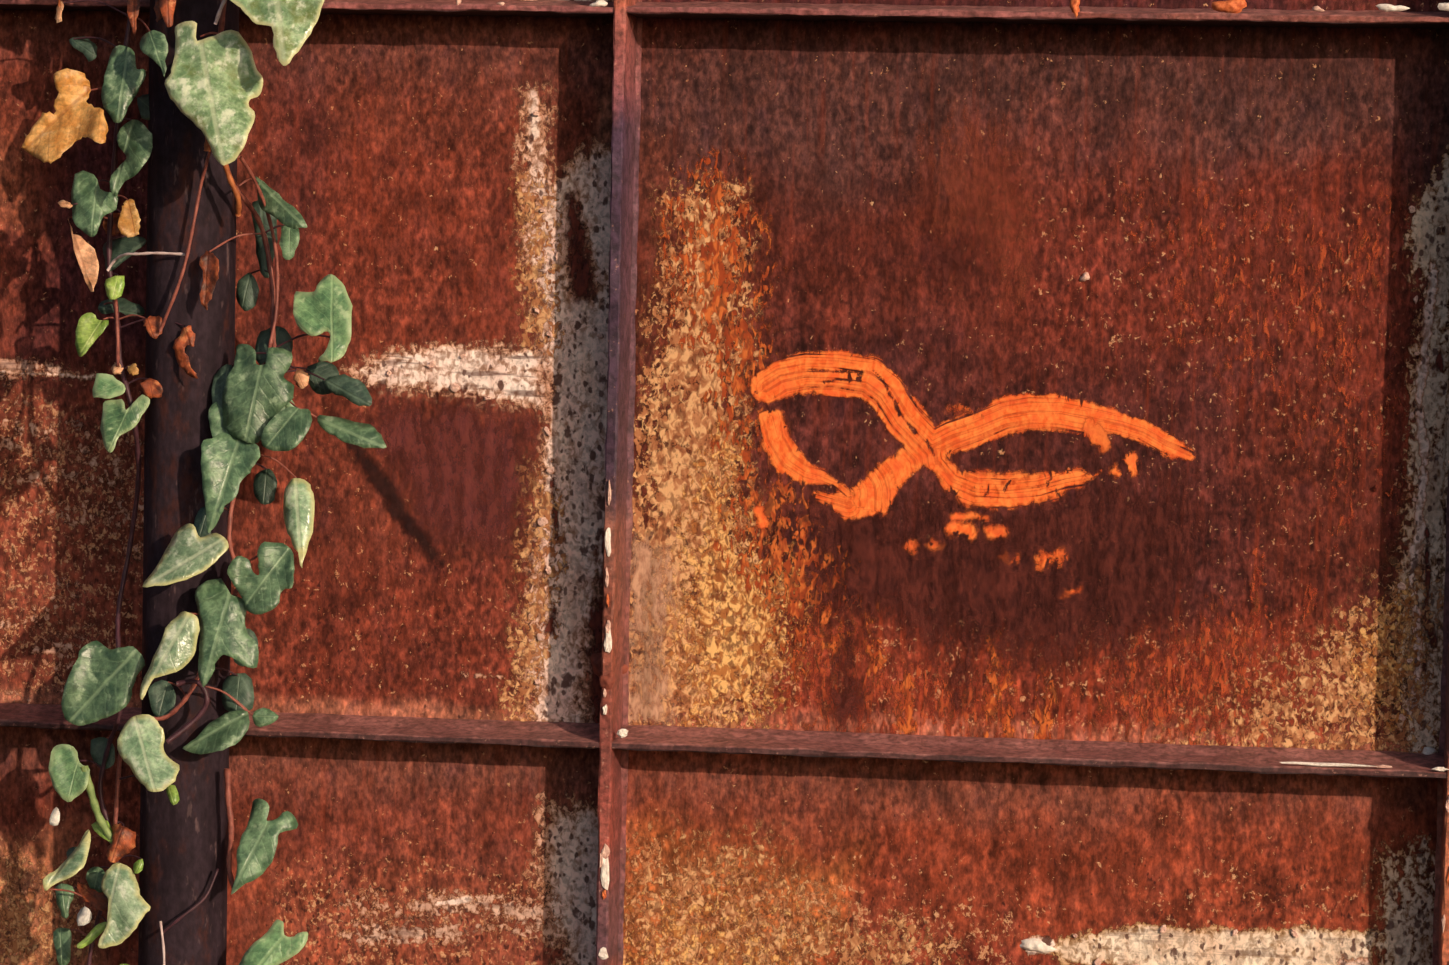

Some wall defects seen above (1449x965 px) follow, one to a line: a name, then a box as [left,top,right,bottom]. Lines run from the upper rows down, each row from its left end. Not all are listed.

corrosion [1069,0,1080,20]
corrosion [1212,0,1247,13]
peeling [340,84,612,723]
corrosion [586,151,1057,740]
corrosion [1123,191,1399,532]
peeling [1389,144,1449,771]
corrosion [1075,547,1445,753]
corrosion [0,849,94,965]
peeling [328,792,610,965]
corrosion [623,824,961,965]
peeling [1020,834,1449,965]